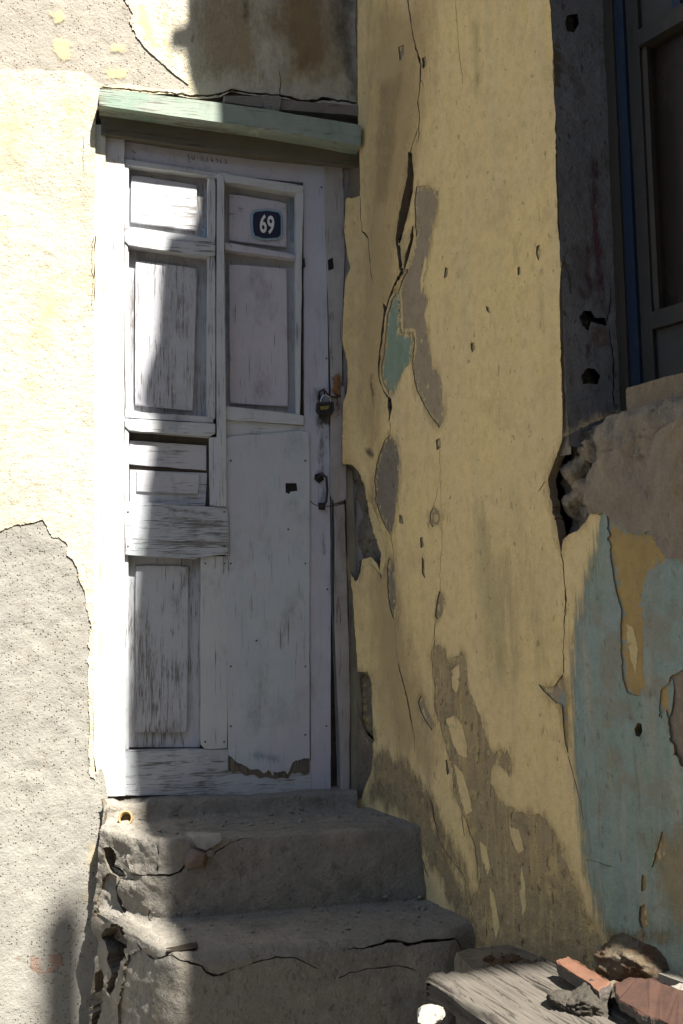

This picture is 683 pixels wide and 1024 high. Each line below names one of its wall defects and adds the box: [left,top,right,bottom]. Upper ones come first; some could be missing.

leakage [366,17,415,417]
crack [383,189,413,331]
flaking render [379,186,443,449]
flaking render [354,436,403,620]
peeling [608,517,665,696]
flaking render [0,520,128,1024]
crack [116,864,185,920]
crack [143,951,223,975]
crack [348,939,450,968]
leakage [370,750,475,937]
flaking render [660,670,683,764]